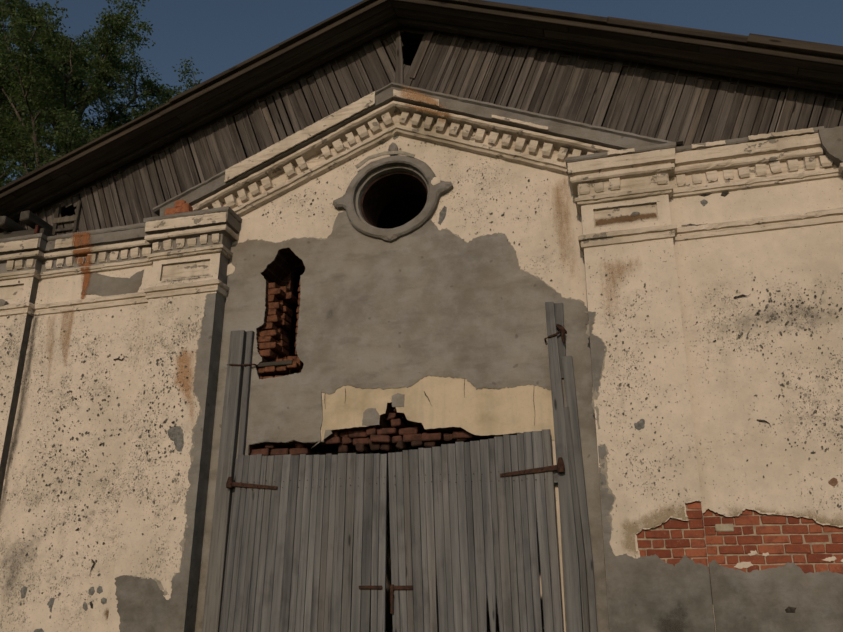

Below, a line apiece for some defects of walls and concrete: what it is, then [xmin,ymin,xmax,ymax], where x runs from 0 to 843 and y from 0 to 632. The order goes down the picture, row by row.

corrosion [72,232,93,301]
flaking render [251,376,555,456]
flaking render [785,400,843,460]
flaking render [636,502,843,602]